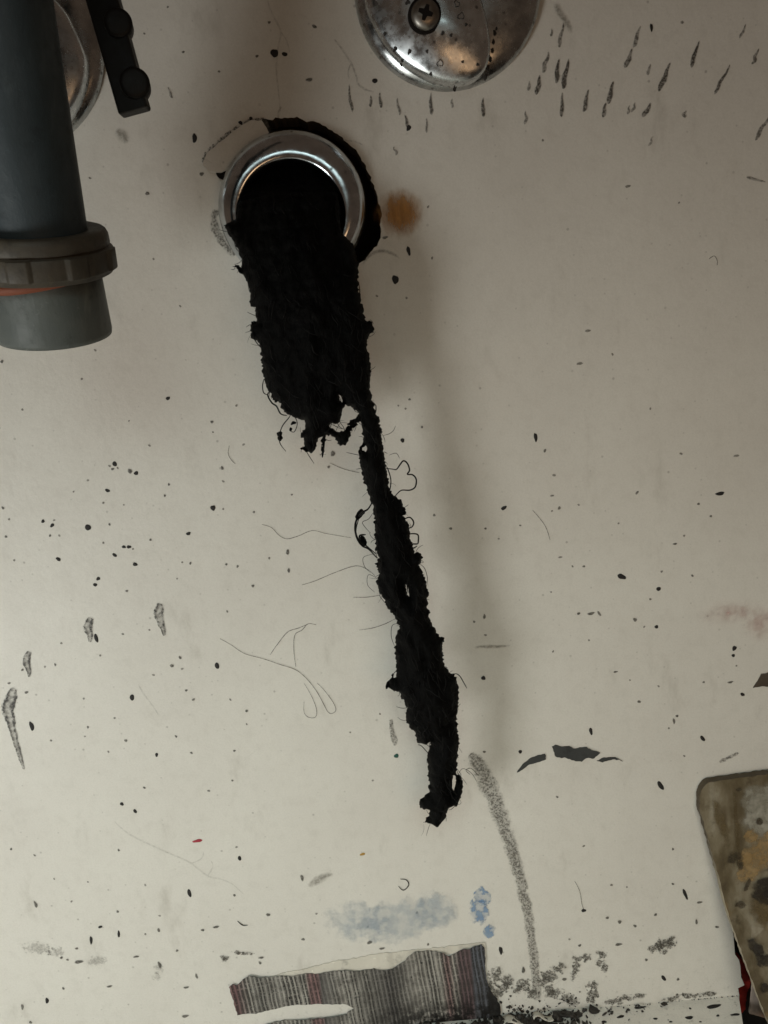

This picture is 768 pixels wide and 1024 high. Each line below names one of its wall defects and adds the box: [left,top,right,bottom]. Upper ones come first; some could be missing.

peeling [202,118,271,179]
rust [386,196,417,230]
peeling [517,745,622,772]
water stain [714,786,768,922]
water stain [748,939,768,967]